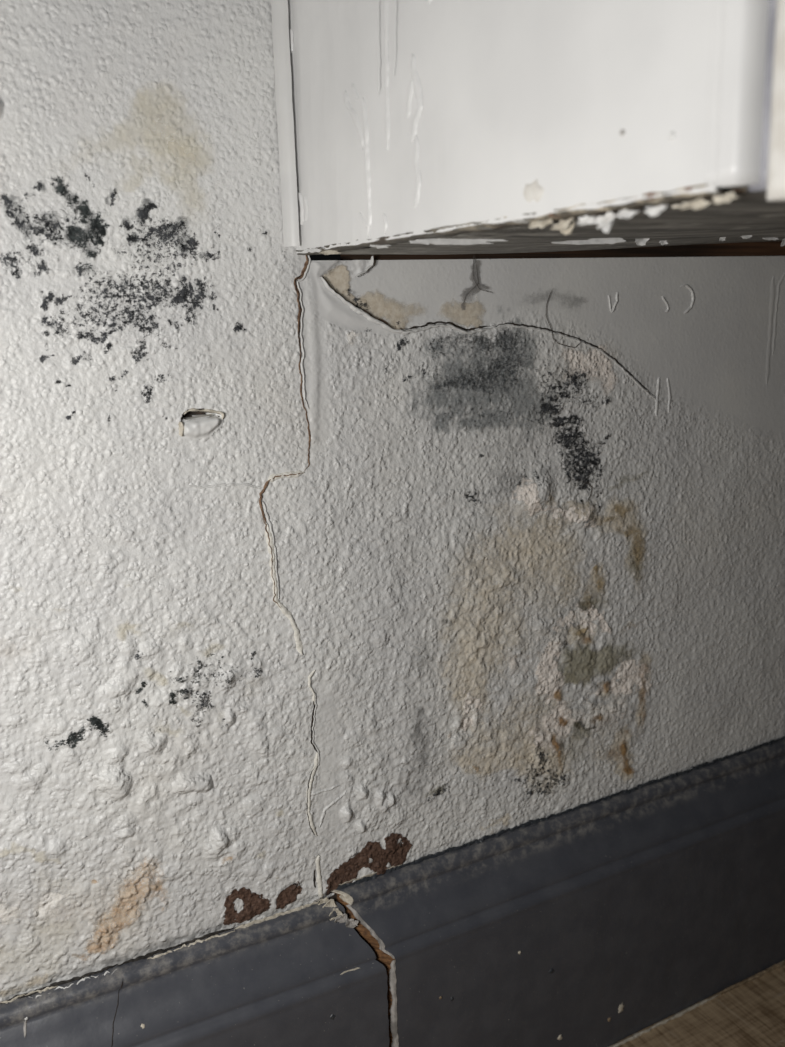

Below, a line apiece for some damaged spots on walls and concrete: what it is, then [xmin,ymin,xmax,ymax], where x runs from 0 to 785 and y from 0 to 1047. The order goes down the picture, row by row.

peeling [527,192,739,246]
damp [0,176,220,391]
peeling [306,245,489,344]
damp [141,374,172,405]
hole [178,408,225,441]
damp [403,328,652,801]
crack [188,255,399,1047]